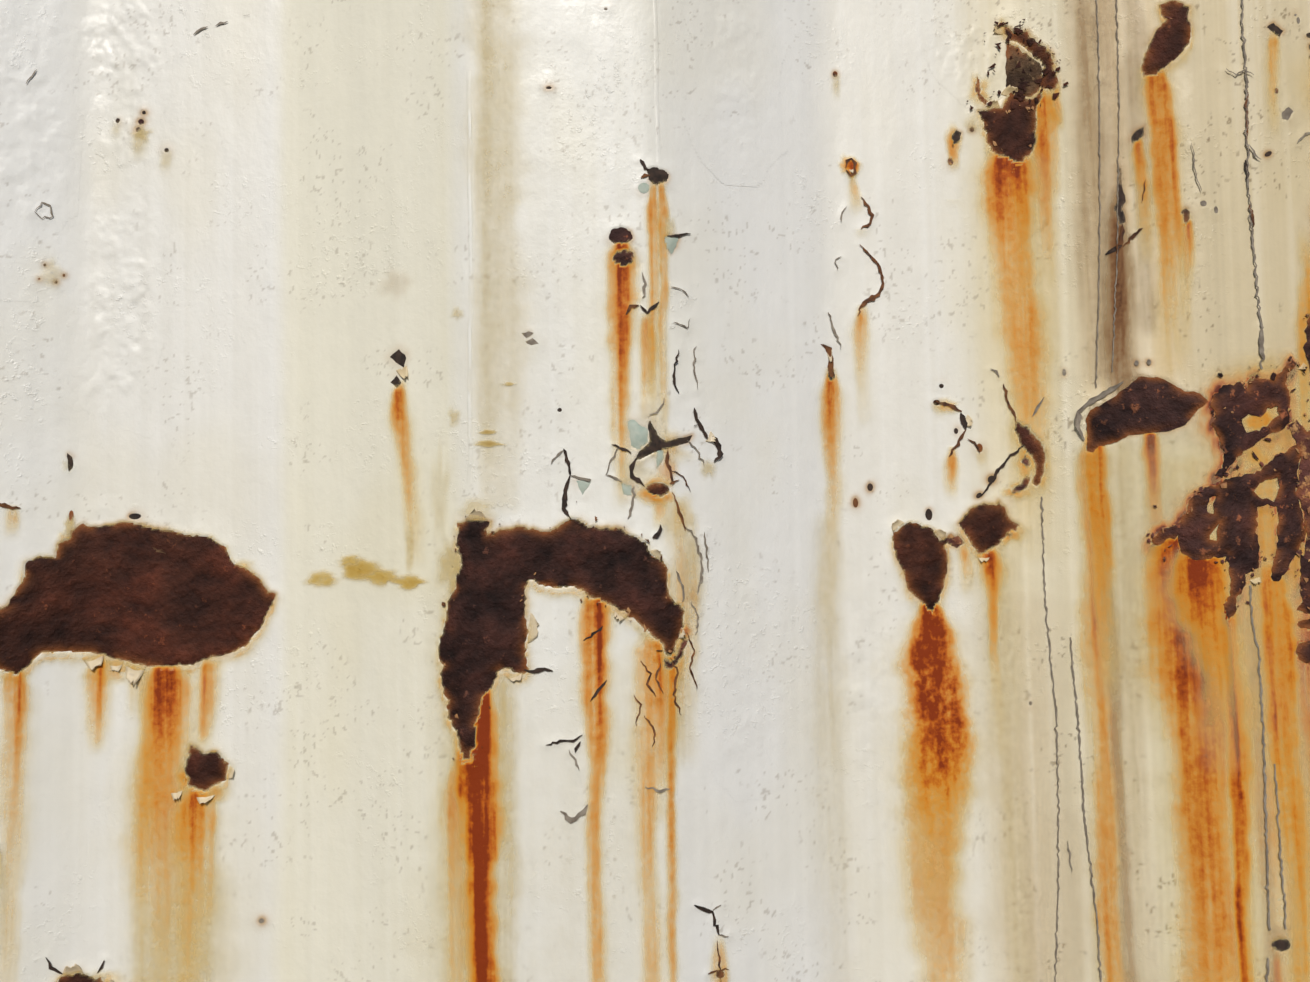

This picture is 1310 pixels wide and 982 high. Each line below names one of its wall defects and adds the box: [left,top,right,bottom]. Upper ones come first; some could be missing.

corrosion [607,159,690,466]
corrosion [821,313,841,479]
corrosion [892,0,1092,982]
corrosion [1075,0,1310,982]
corrosion [0,510,276,982]
corrosion [432,509,686,982]